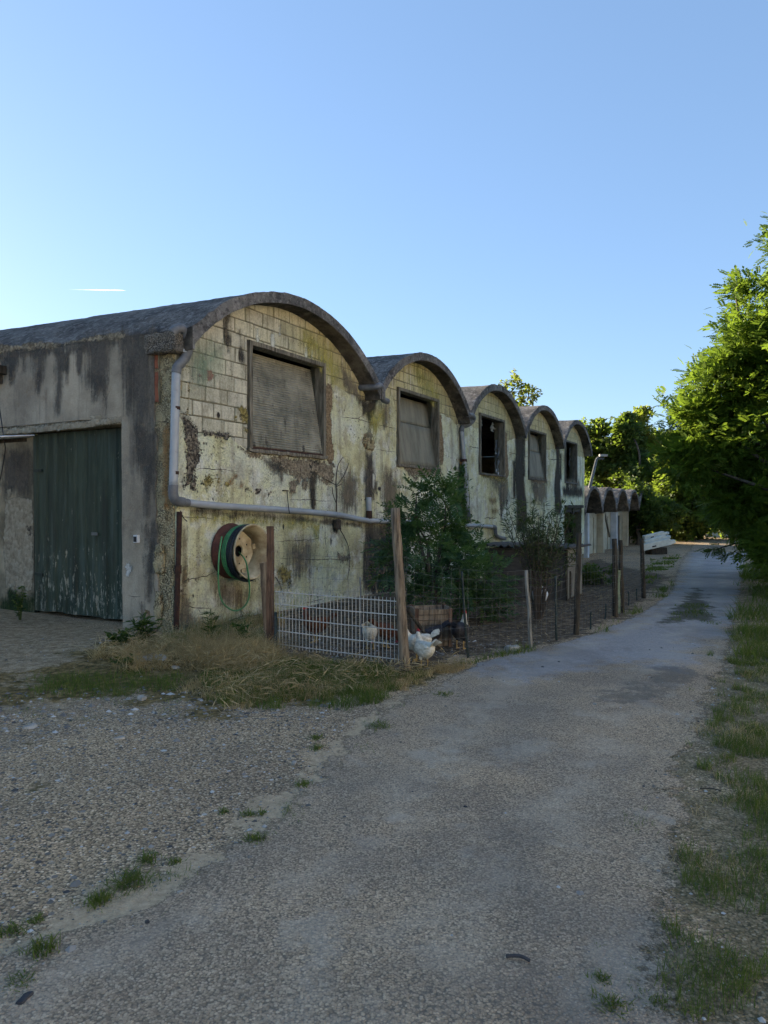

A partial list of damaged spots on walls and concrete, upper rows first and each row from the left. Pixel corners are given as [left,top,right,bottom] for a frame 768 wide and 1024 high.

water stain [0,325,158,597]
spalling [181,383,335,494]
water stain [192,451,408,593]
water stain [343,368,390,439]
water stain [495,436,583,533]